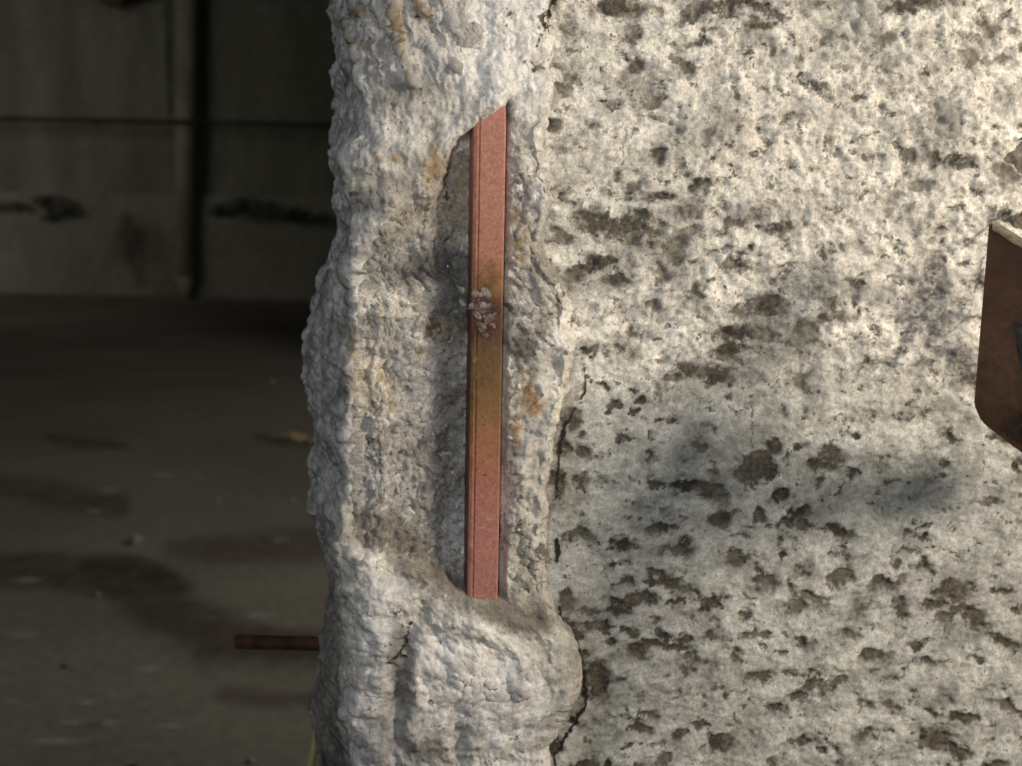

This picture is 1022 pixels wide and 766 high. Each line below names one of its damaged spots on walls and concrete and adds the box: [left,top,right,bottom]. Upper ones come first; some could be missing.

spalling [348,146,470,577]
rust [426,297,500,337]
spalling [503,144,570,599]
crack [553,358,586,501]
crack [554,538,562,563]
crack [553,606,588,766]